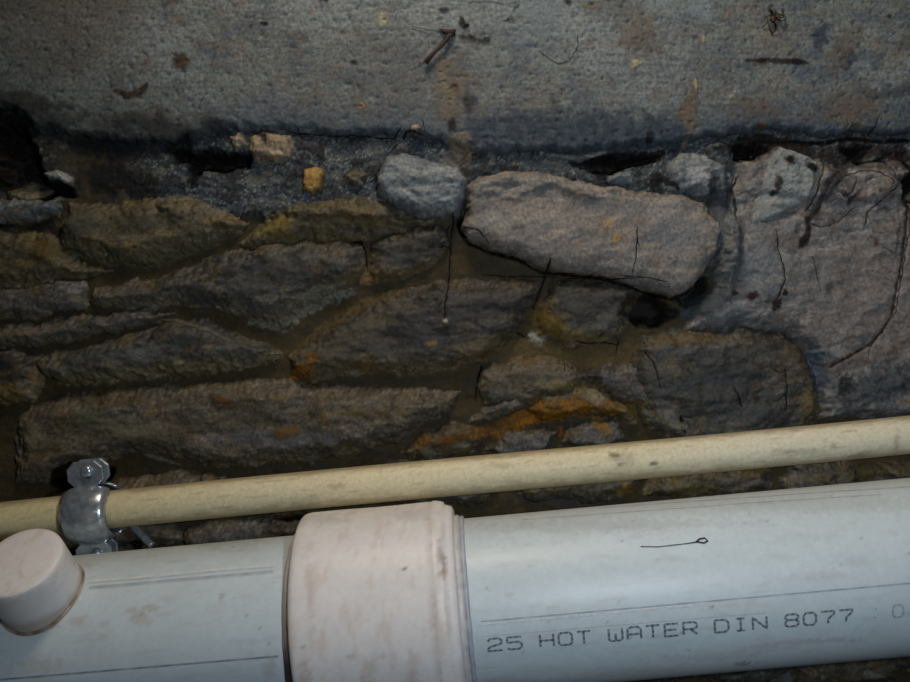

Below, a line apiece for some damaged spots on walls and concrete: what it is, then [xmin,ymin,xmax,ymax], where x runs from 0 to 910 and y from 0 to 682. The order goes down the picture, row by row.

water stain [114,83,148,99]
crack [730,175,739,220]
crack [758,116,910,369]
crack [439,213,726,343]
rust [416,397,618,447]